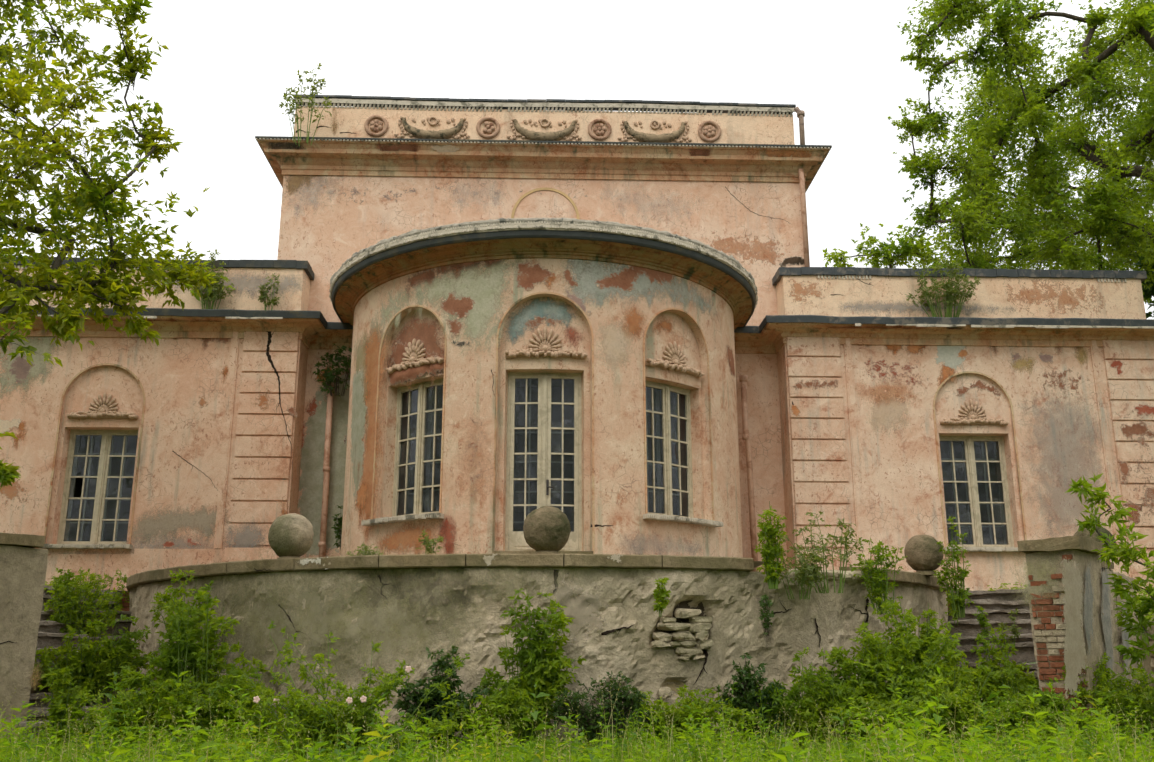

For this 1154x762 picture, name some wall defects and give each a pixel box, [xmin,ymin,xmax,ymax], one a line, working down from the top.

flaking render [516,259,591,315]
flaking render [596,265,676,292]
crack [266,331,293,469]
flaking render [865,345,969,394]
peeling [956,380,1001,399]
peeling [1039,353,1091,398]
peeling [1110,360,1123,375]
peeling [1116,404,1154,526]
flaking render [544,575,611,645]
spalling [650,600,713,660]
flaking render [1028,554,1131,713]